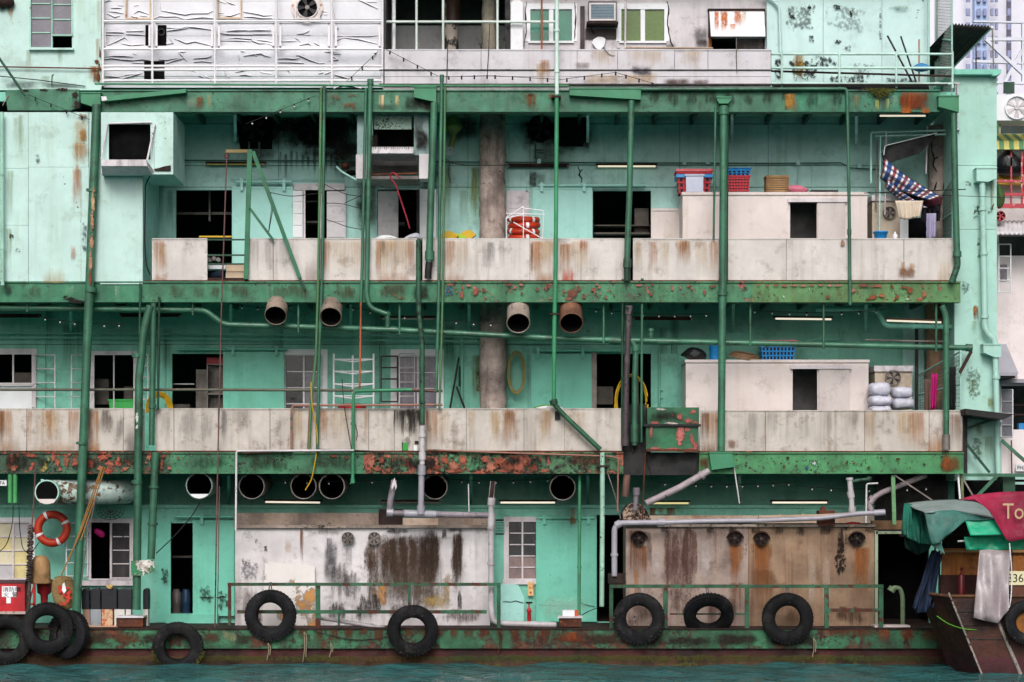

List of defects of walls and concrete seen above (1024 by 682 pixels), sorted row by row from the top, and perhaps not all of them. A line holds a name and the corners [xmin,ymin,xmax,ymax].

water stain [775,55,867,82]
rust [900,93,929,113]
rust [531,241,570,261]
rust [145,269,949,298]
peeling [649,408,698,450]
rust [699,442,964,470]
water stain [326,528,479,620]
rust [665,533,697,594]
rust [730,544,771,583]